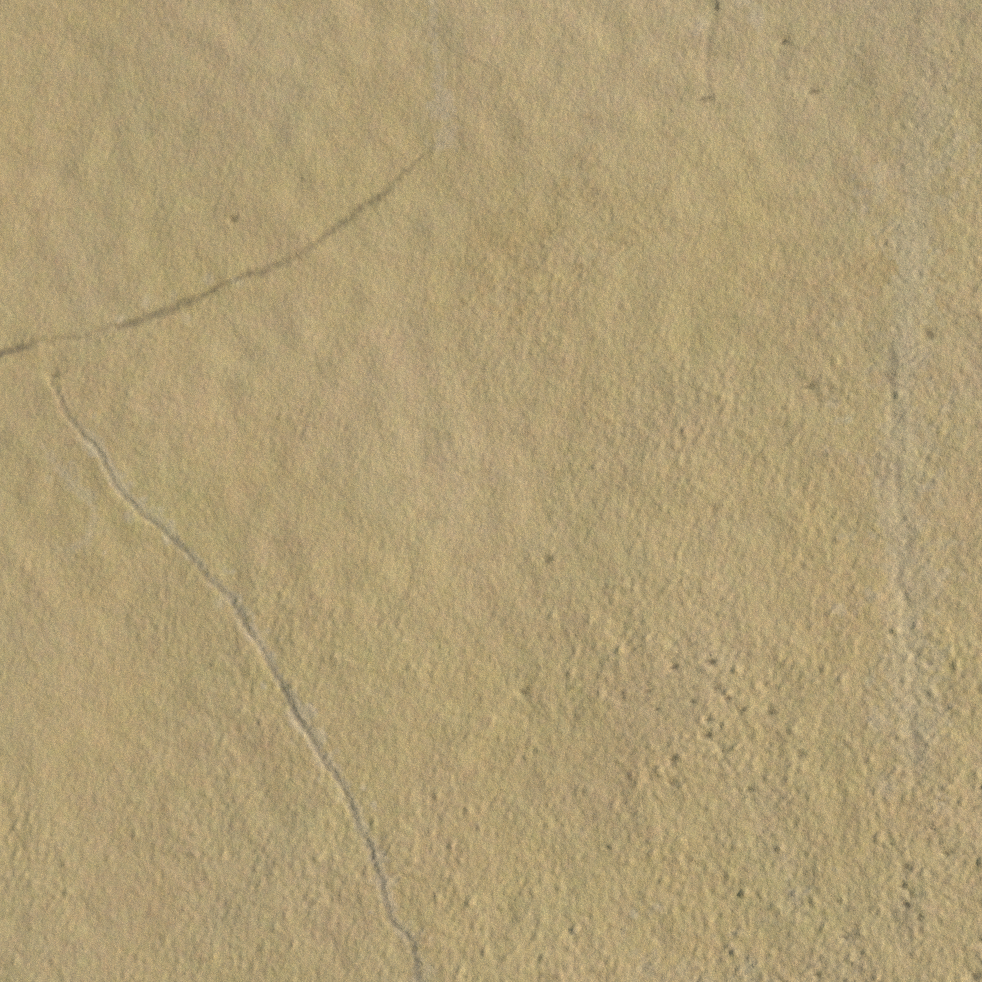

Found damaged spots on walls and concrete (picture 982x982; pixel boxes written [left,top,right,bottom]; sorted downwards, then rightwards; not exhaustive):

crack [690,0,775,59]
crack [115,272,245,326]
crack [35,387,438,982]